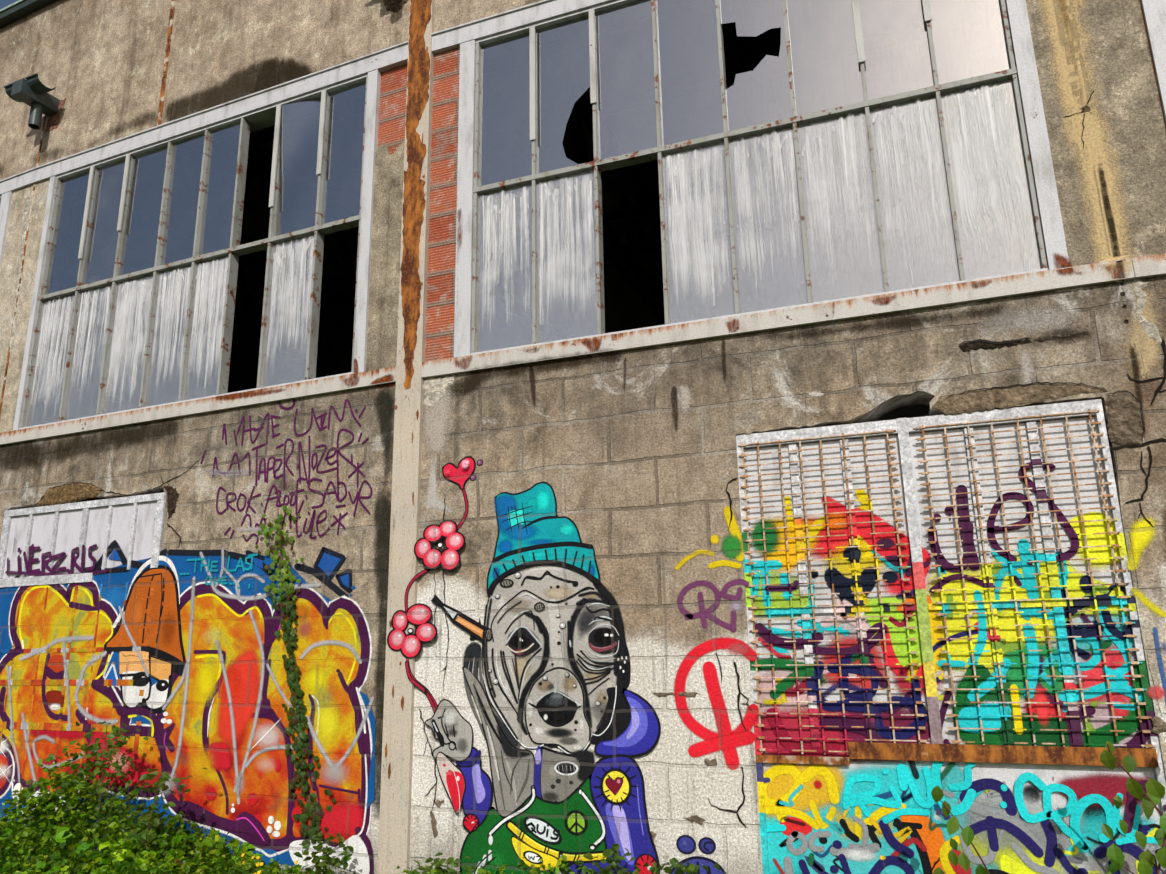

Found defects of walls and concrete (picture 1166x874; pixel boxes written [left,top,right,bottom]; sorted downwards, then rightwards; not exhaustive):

crack [1065,90,1094,147]
rust [344,0,432,389]
rust [1055,254,1081,274]
rust [582,338,602,351]
spalling [959,331,1088,352]
crack [1127,337,1166,405]
spalling [36,482,103,506]
spalling [164,486,179,519]
crack [1111,438,1166,528]